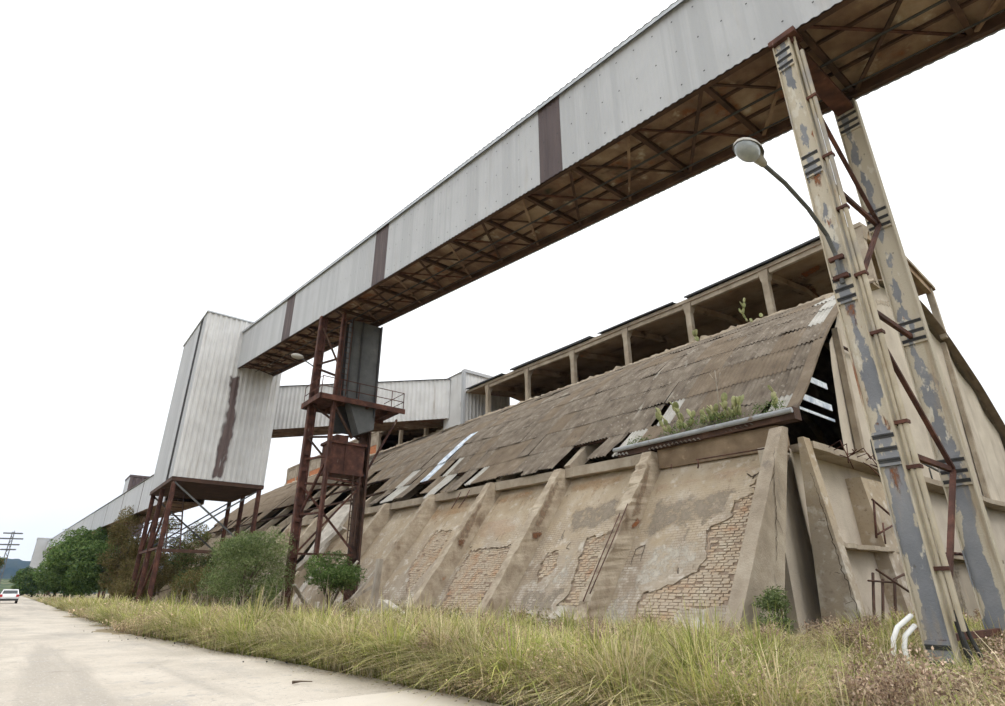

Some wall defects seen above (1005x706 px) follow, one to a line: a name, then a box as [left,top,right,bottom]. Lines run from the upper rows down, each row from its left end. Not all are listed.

spalling [436,538,516,621]
spalling [529,503,628,619]
spalling [623,477,758,632]